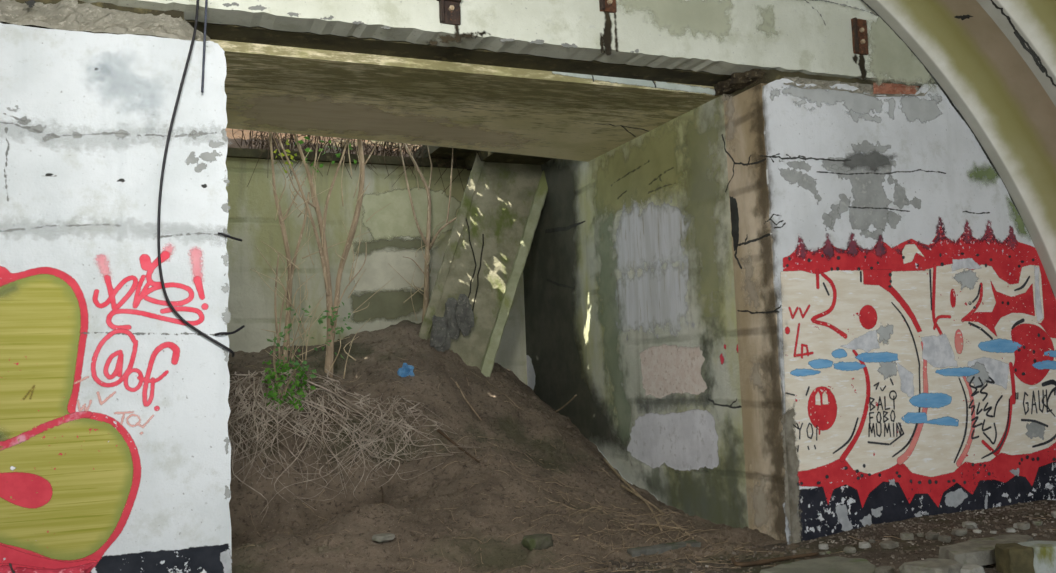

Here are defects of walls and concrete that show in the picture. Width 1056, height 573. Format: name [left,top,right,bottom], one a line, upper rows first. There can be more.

corrosion [600,12,618,55]
crack [990,0,1056,87]
corrosion [853,54,867,80]
peeling [770,77,942,123]
crack [4,105,216,201]
peeling [779,140,921,241]
crack [7,224,120,232]
crack [735,214,786,247]
water stain [637,79,789,542]